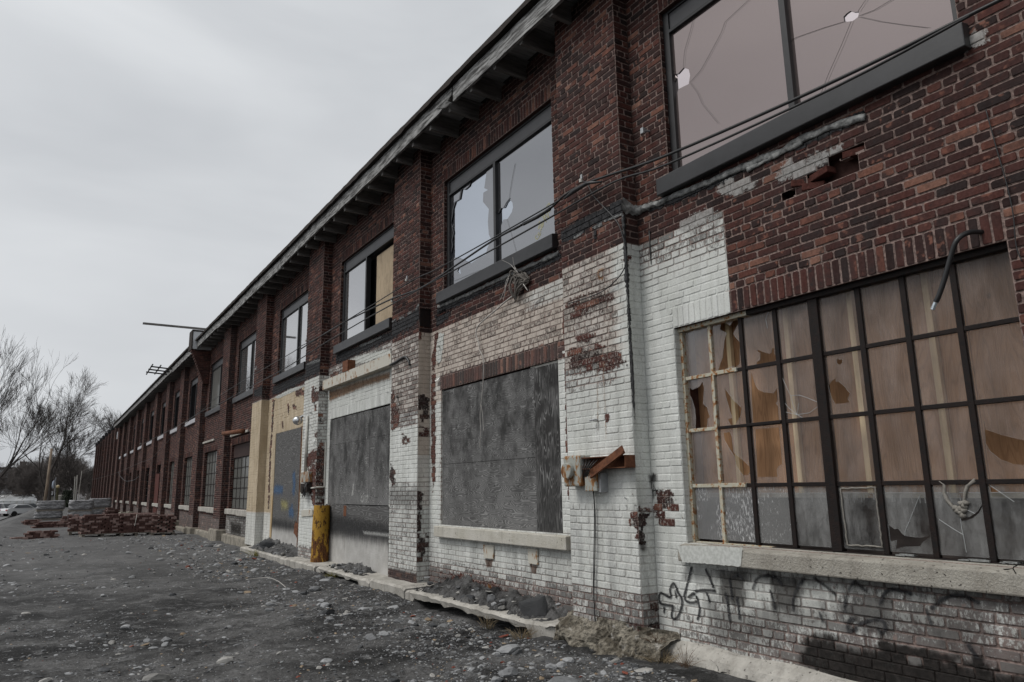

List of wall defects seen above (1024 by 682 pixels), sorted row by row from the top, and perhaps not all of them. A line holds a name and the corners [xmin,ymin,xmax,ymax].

peeling [268,370,339,509]
peeling [387,332,444,562]
peeling [562,290,628,455]
peeling [625,488,683,551]